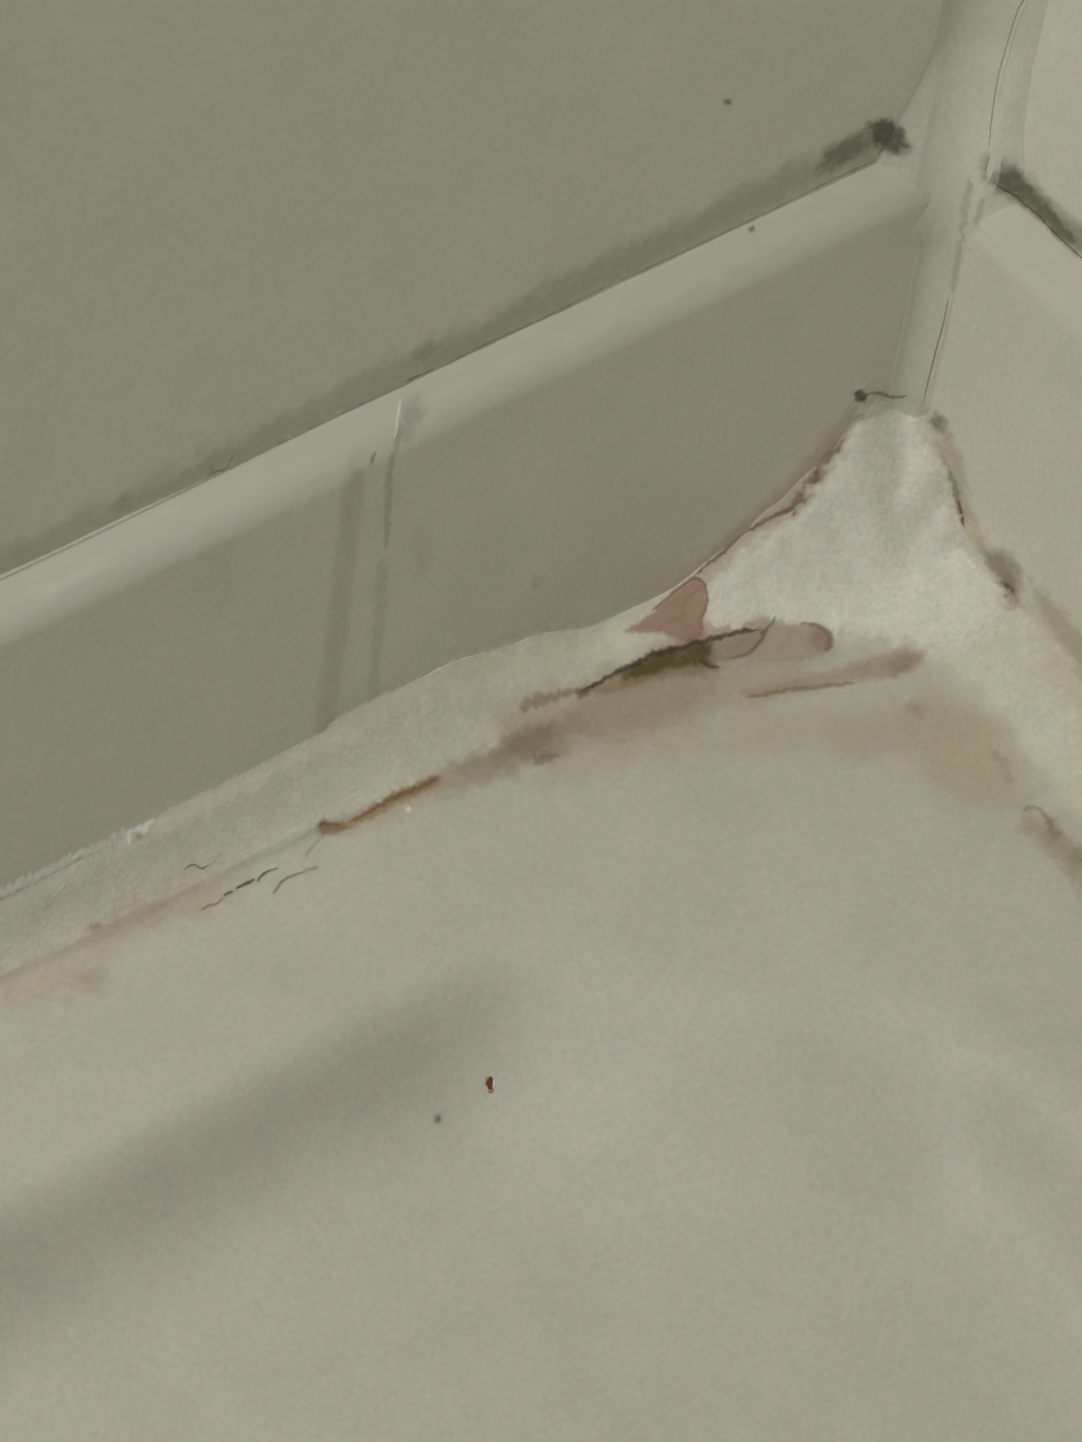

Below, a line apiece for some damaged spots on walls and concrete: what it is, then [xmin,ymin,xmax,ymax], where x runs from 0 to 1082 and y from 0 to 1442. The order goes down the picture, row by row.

leakage [873,121,907,152]
crack [923,302,948,401]
peeling [631,577,708,642]
rust [319,778,436,833]